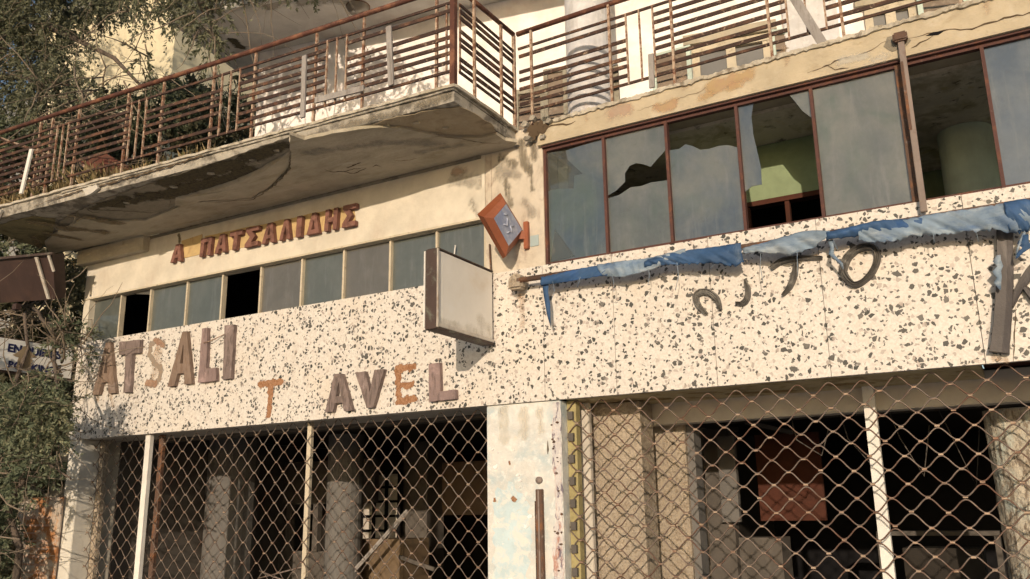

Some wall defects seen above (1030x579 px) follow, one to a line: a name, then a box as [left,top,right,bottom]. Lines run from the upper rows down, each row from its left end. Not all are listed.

crack [808,41,886,73]
crack [912,12,1030,48]
spalling [0,137,291,247]
water stain [496,139,537,207]
peeling [491,473,533,579]
peeling [551,402,565,579]